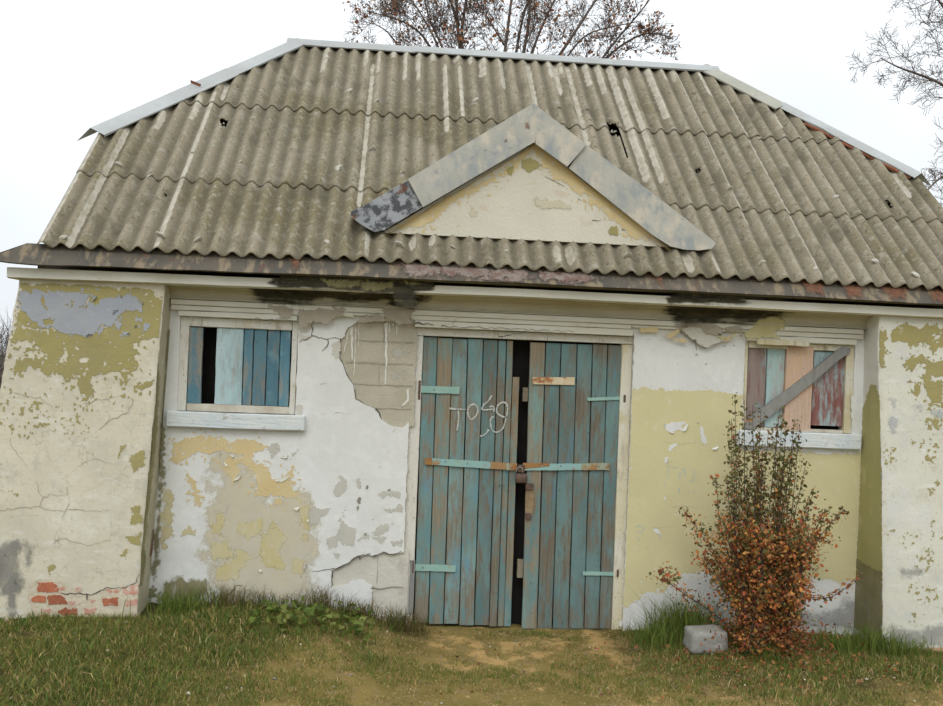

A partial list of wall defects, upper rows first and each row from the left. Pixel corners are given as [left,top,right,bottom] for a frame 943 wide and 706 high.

peeling [0,283,162,439]
crack [87,396,134,429]
crack [255,318,396,432]
spalling [268,304,418,428]
peeling [879,321,943,464]
damp [0,540,31,617]
crack [0,484,109,546]
spalling [27,564,139,617]
peeling [159,429,330,550]
crack [303,551,401,587]
spalling [326,475,409,618]
peeling [740,385,943,627]